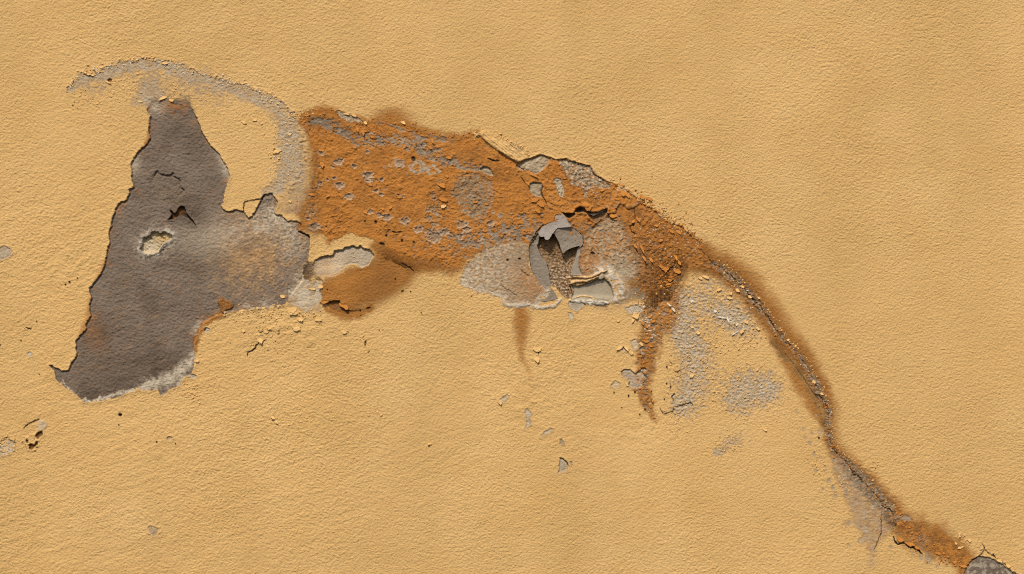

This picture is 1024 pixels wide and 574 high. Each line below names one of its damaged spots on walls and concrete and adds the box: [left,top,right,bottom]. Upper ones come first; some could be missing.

peeling [50,95,374,403]
peeling [460,155,642,319]
corrosion [286,107,833,421]
peeling [558,458,572,473]
crack [703,252,1013,573]
corrosion [827,433,974,574]
peeling [955,533,1016,574]